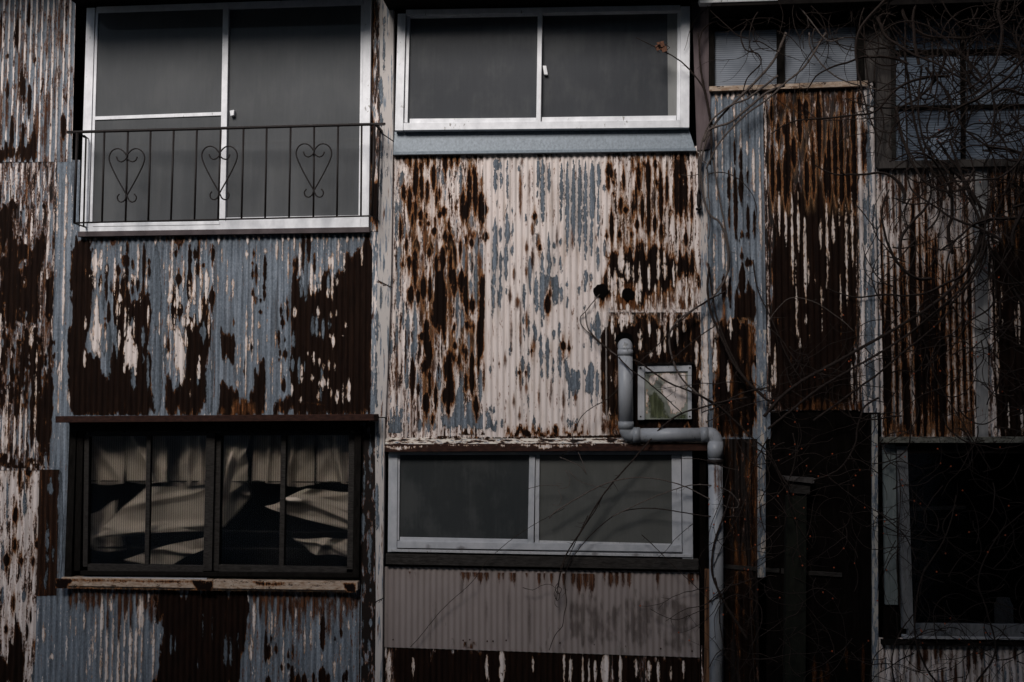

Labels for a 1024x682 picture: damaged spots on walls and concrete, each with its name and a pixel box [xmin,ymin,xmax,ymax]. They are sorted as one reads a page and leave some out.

peeling [1,326,39,525]
peeling [56,166,68,326]
peeling [57,341,70,413]
peeling [83,233,364,415]
peeling [361,141,428,593]
peeling [454,156,695,433]
corrosion [394,139,757,682]
corrosion [769,87,975,437]
corrosion [991,169,1024,437]
peeling [44,471,63,590]
peeling [69,594,155,682]
peeling [202,590,320,678]